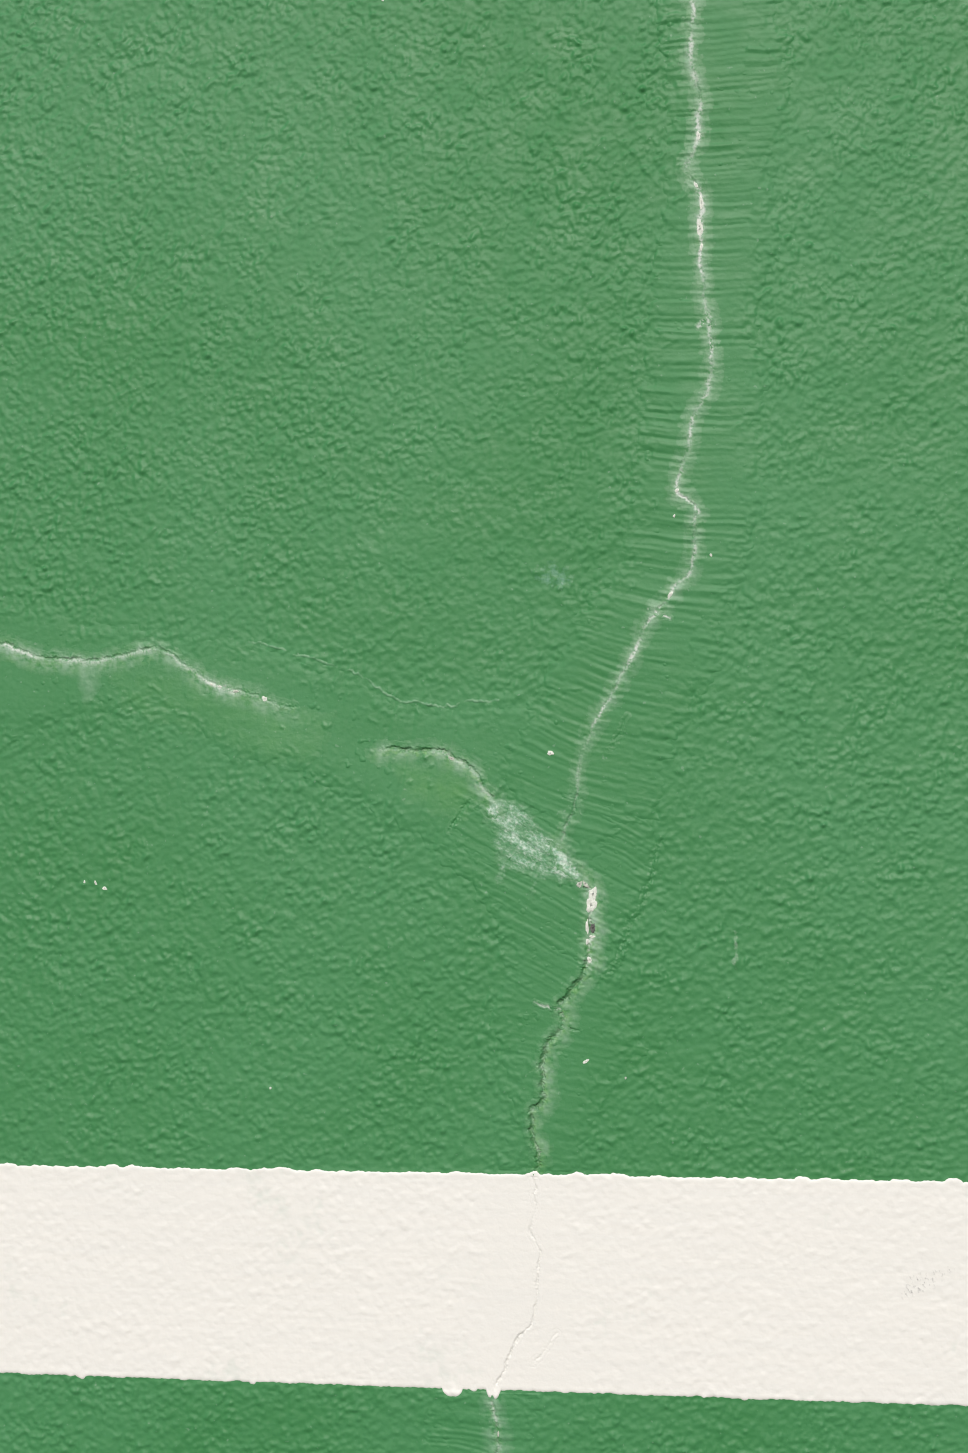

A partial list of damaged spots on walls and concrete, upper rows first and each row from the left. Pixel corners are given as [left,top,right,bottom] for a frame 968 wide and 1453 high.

crack [521,0,725,1175]
crack [0,630,300,722]
crack [364,735,508,804]
crack [477,1391,515,1453]